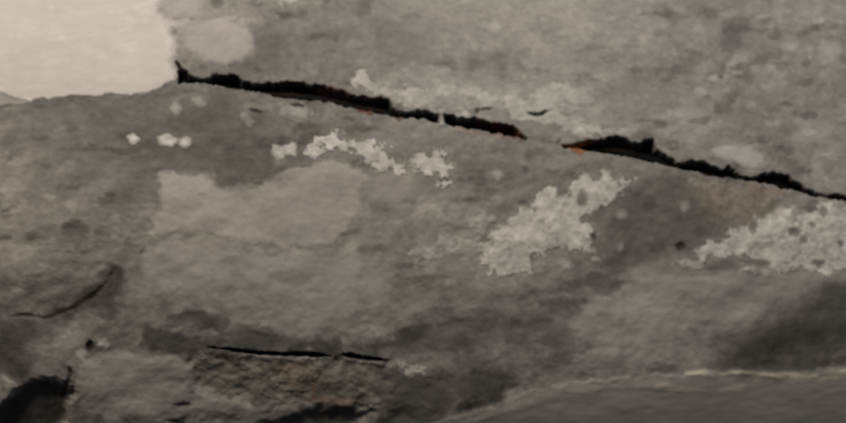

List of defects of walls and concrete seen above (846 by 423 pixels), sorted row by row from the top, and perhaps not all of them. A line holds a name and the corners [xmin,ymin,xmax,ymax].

peeling [126,131,141,145]
peeling [156,133,194,148]
spalling [0,0,404,122]
crack [175,60,528,141]
crack [526,109,553,117]
spalling [243,0,846,343]
crack [555,135,838,201]
spalling [58,218,92,238]
spalling [0,225,196,423]
crack [208,346,390,363]
water stain [135,161,729,423]
spalling [180,344,766,423]